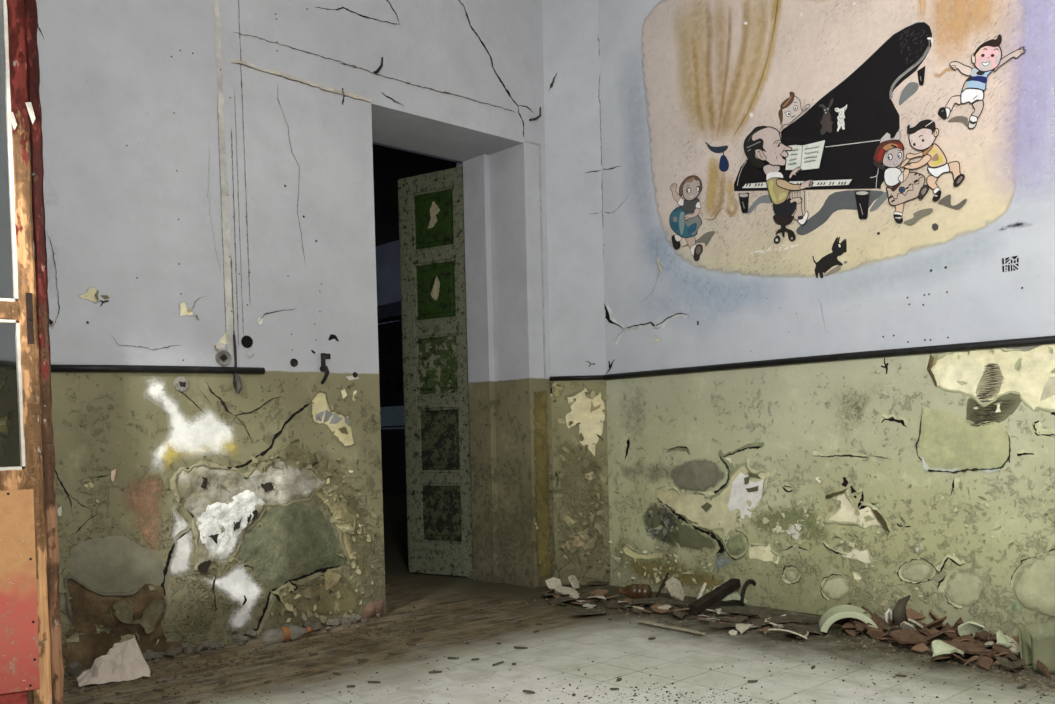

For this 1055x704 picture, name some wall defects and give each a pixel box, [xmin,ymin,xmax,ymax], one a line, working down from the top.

crack [231,0,534,258]
peeling [77,286,109,304]
peeling [178,301,199,320]
crack [586,248,689,374]
peeling [926,344,1055,413]
crack [181,383,309,472]
crack [55,470,98,539]
crack [161,467,198,600]
flaking render [163,374,385,623]
peeling [533,381,1002,606]
crack [210,572,218,615]
crack [242,565,342,639]